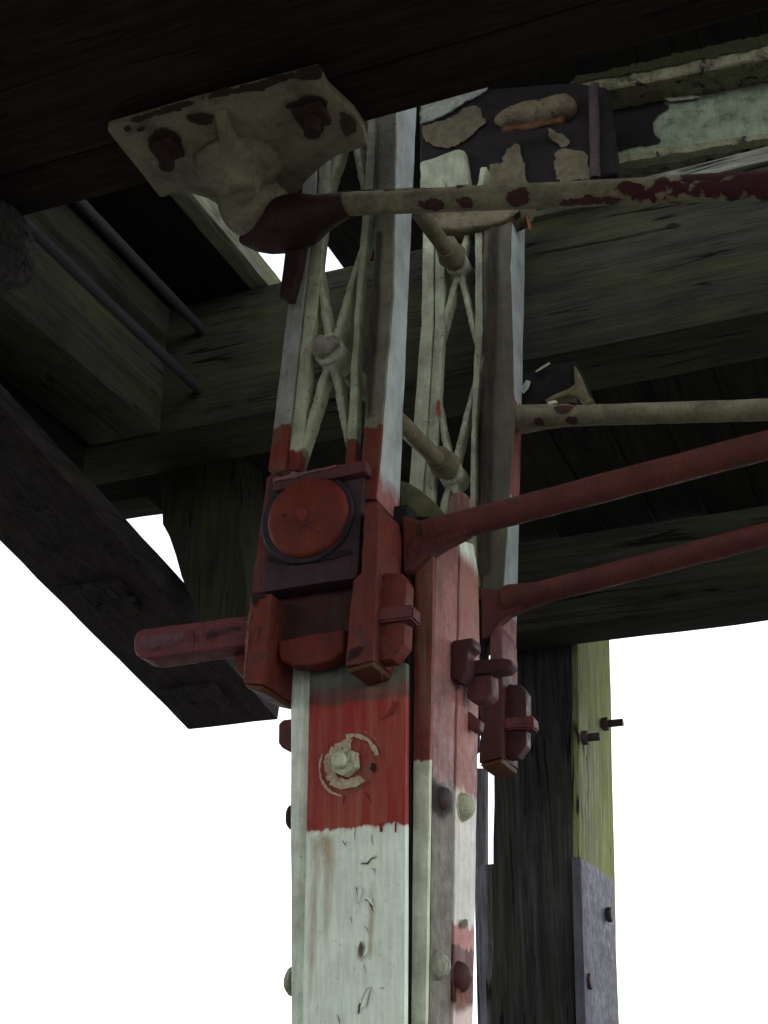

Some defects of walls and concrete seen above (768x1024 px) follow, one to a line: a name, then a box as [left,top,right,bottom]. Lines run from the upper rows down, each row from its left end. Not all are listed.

peeling [124,64,322,132]
peeling [420,88,487,149]
peeling [613,95,700,150]
peeling [337,184,473,212]
peeling [488,143,530,207]
peeling [548,128,590,182]
peeling [319,730,379,797]